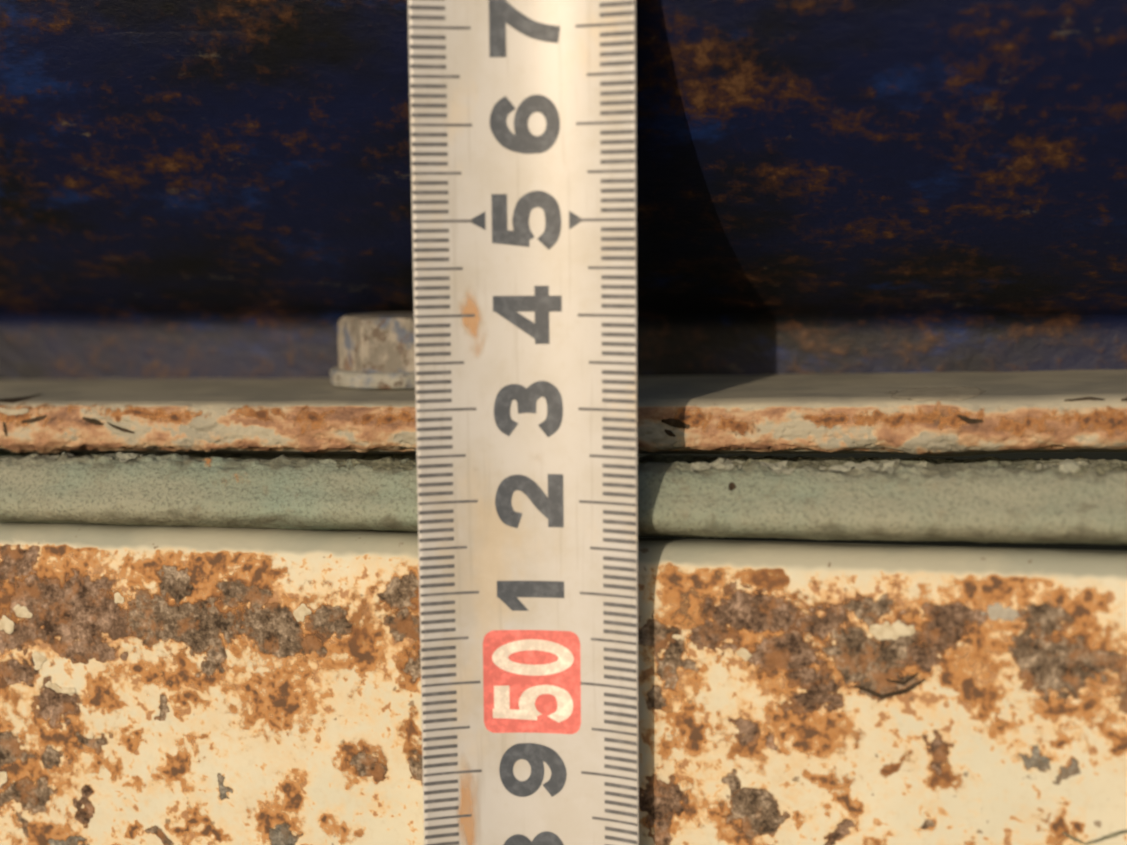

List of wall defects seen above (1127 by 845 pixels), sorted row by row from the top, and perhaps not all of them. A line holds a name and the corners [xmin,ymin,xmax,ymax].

rust [803,402,984,430]
peeling [0,544,353,755]
rust [0,544,422,845]
rust [639,564,892,845]
peeling [638,582,1127,715]
rust [883,574,1127,760]
peeling [0,731,72,838]
peeling [48,785,95,845]
peeling [717,769,790,844]
rust [927,760,962,791]
peeling [1018,746,1081,785]
rust [1037,808,1085,845]